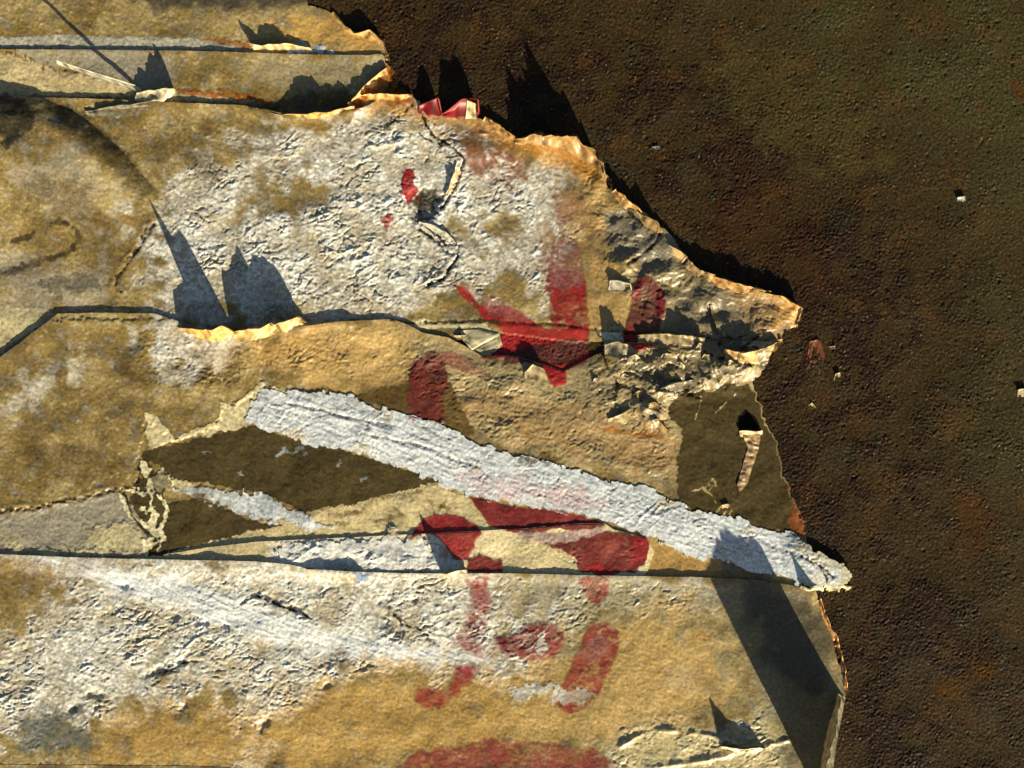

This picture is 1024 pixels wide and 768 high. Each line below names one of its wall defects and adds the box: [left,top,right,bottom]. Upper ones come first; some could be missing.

peeling [249,43,313,51]
peeling [0,54,255,119]
peeling [271,12,664,246]
peeling [669,245,803,328]
peeling [178,316,307,343]
peeling [403,318,502,356]
peeling [600,331,705,356]
peeling [709,304,782,365]
peeling [0,380,489,561]
peeling [647,380,794,531]
rust [787,486,805,537]
peeling [800,585,852,768]